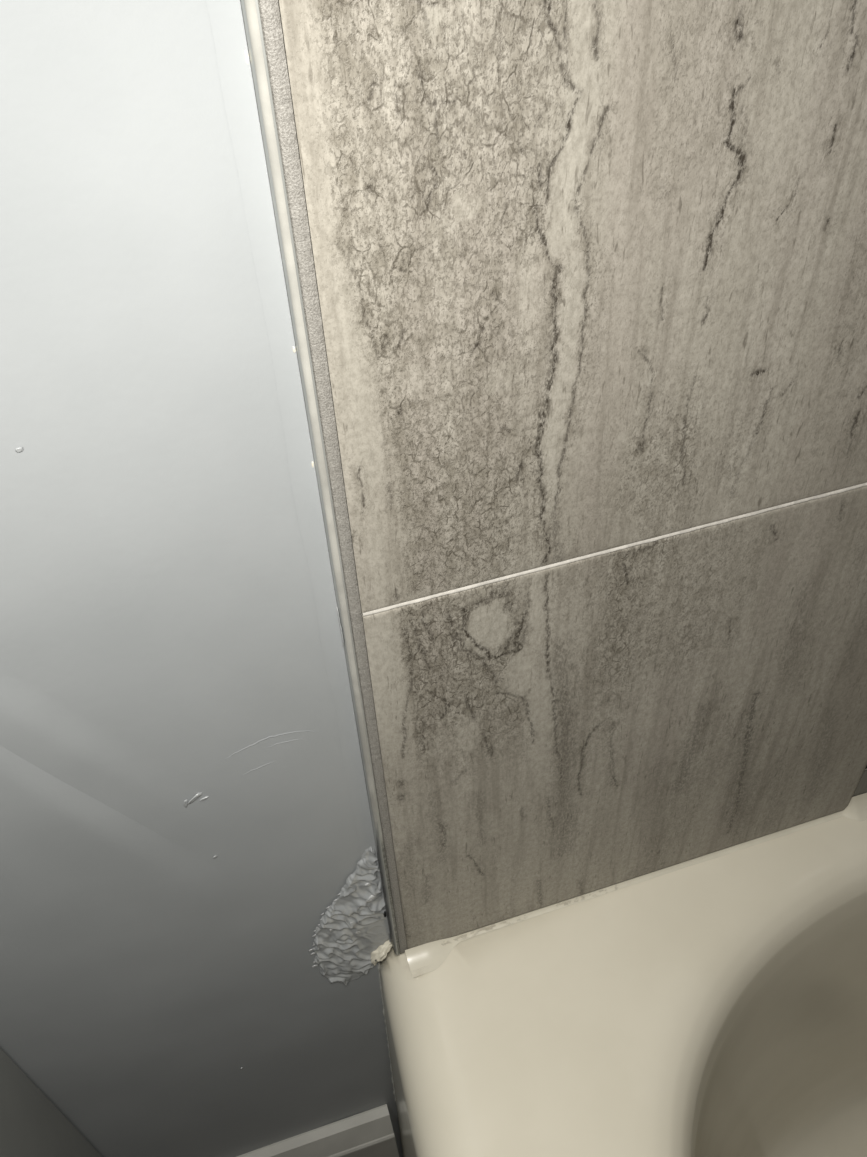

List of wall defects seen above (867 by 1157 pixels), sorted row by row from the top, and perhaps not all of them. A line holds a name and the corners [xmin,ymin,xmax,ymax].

peeling [308,847,389,986]